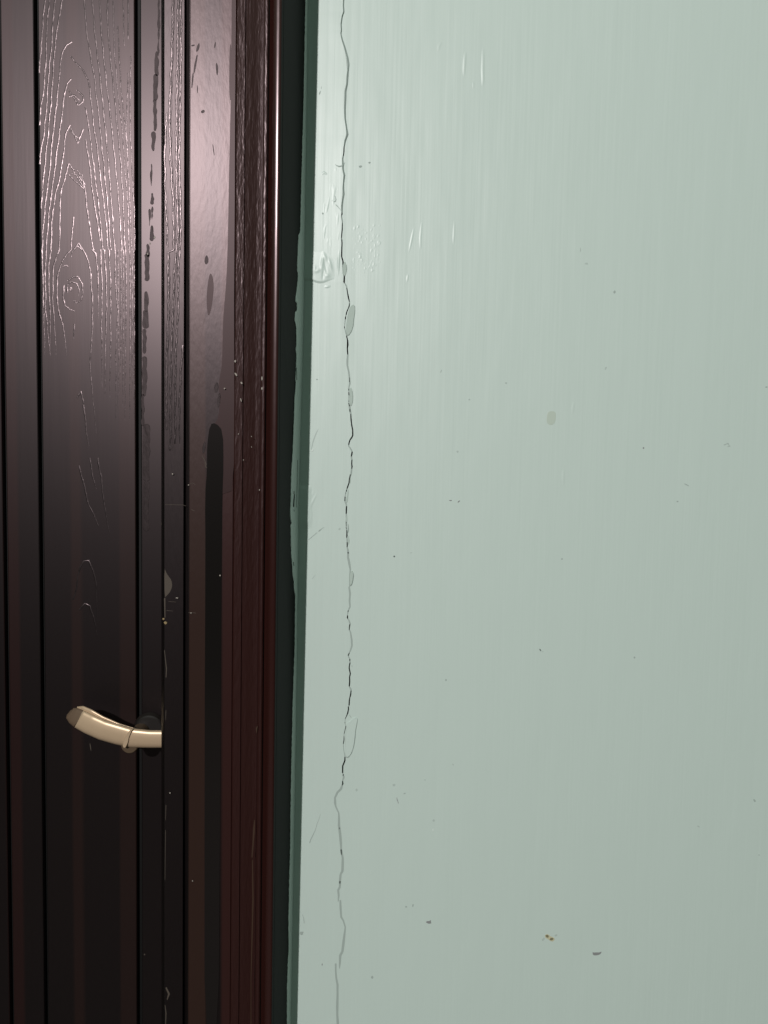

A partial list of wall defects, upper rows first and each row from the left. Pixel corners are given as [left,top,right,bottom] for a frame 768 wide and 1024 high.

crack [334,0,353,1024]